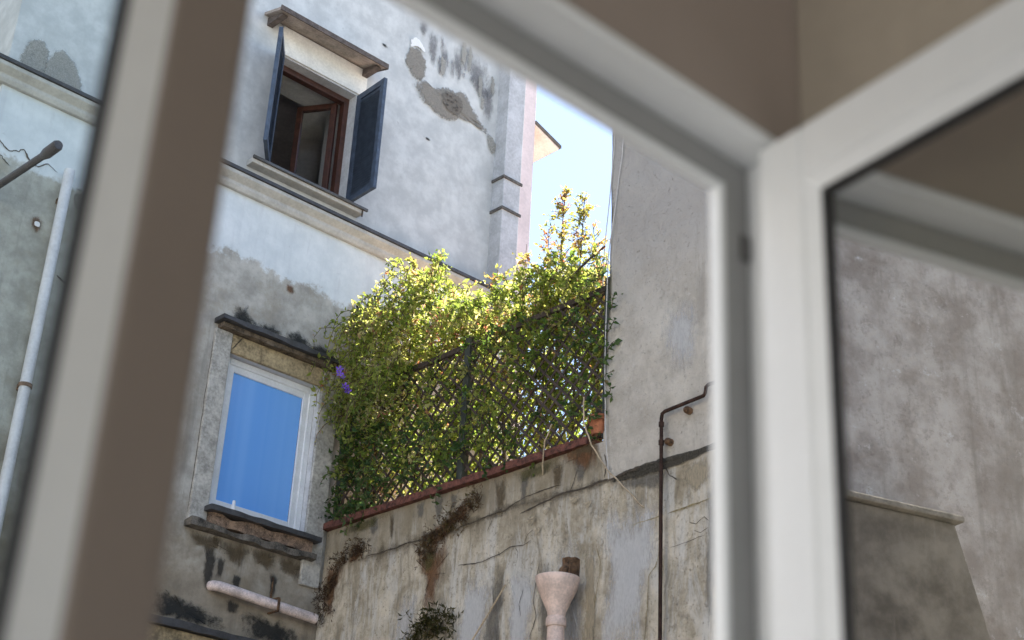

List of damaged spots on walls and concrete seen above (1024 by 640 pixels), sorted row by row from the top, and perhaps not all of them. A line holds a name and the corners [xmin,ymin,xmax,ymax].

spalling [20,39,82,91]
spalling [405,37,496,153]
damp [235,308,329,354]
crack [368,454,610,566]
damp [496,482,505,508]
corrosion [685,462,710,489]
damp [194,535,300,594]
damp [157,590,239,627]
damp [247,616,296,640]